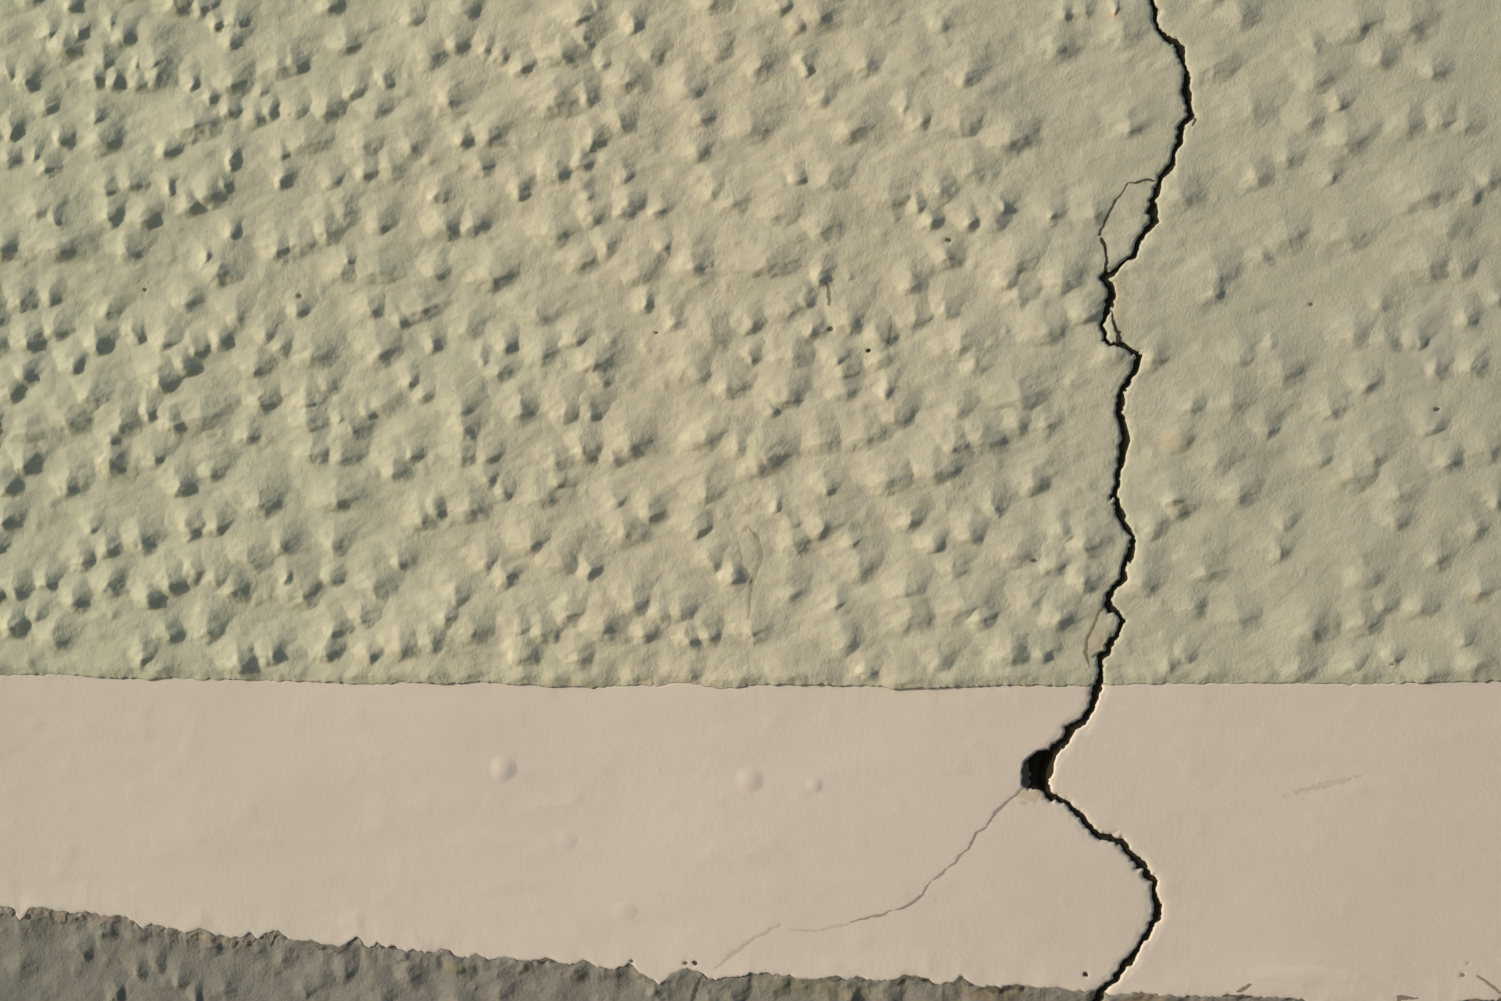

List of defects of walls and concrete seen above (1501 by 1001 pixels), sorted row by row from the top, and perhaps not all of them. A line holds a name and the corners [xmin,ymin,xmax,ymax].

crack [651,0,1197,1001]